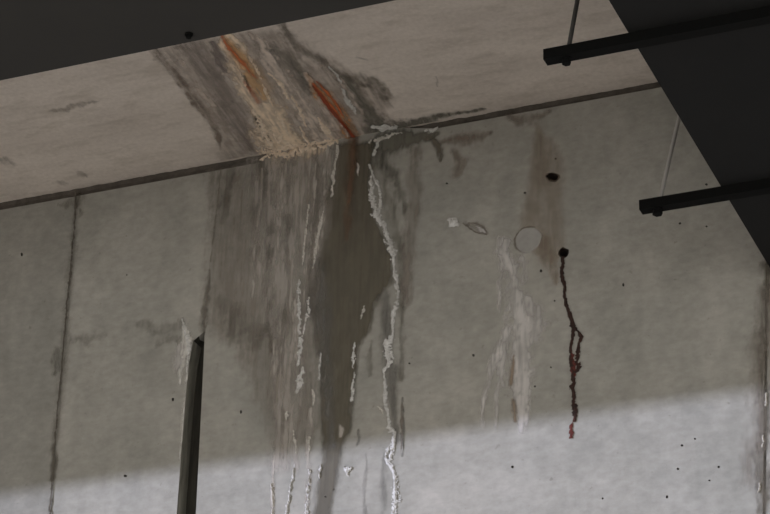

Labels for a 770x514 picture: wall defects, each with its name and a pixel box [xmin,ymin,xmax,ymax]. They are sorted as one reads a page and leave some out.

rust [312,81,357,204]
water stain [176,319,193,384]
water stain [210,33,492,514]
water stain [481,237,546,432]
crack [560,257,584,439]